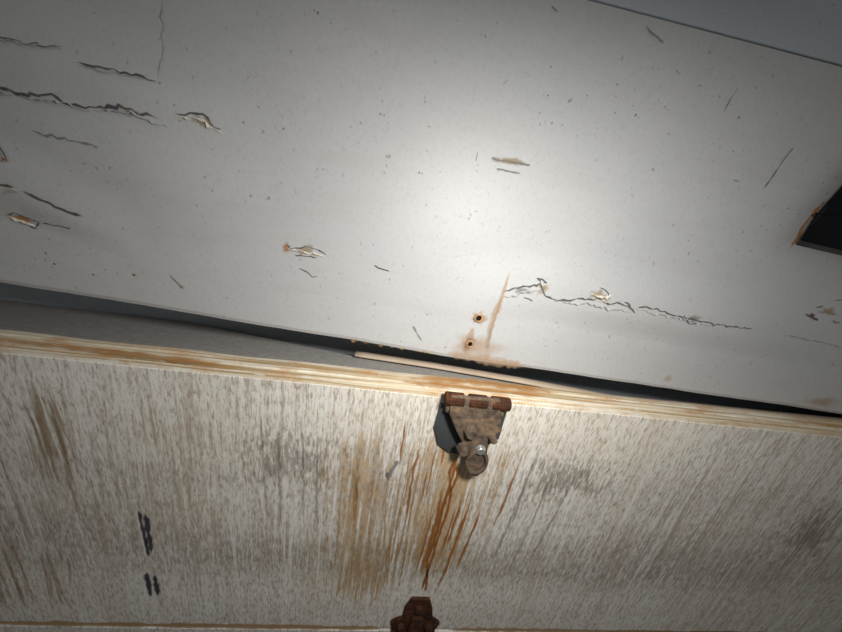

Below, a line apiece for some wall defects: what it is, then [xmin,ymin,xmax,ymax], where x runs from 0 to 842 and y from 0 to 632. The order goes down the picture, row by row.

crack [79,0,164,82]
peeling [0,87,167,127]
peeling [173,112,222,134]
peeling [0,184,81,216]
spalling [7,212,70,229]
peeling [284,244,325,258]
peeling [502,278,635,313]
crack [636,306,752,329]
rust [388,426,405,477]
rust [406,448,478,591]
rust [0,621,379,630]